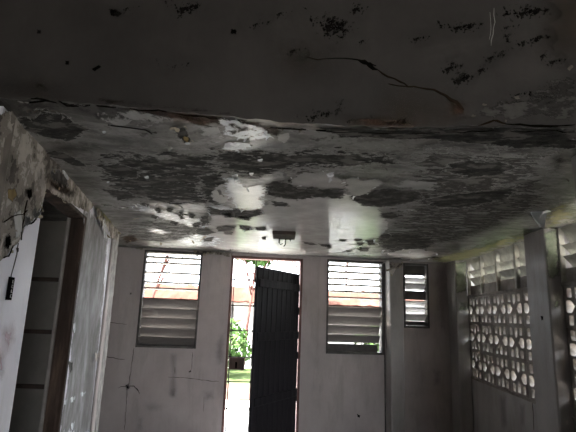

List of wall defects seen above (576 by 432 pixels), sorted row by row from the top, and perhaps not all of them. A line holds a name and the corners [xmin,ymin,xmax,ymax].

leakage [310,12,354,44]
leakage [496,5,551,49]
crack [307,57,464,110]
crack [478,120,575,128]
peeling [0,100,576,432]
leakage [545,230,559,278]
crack [108,349,139,430]